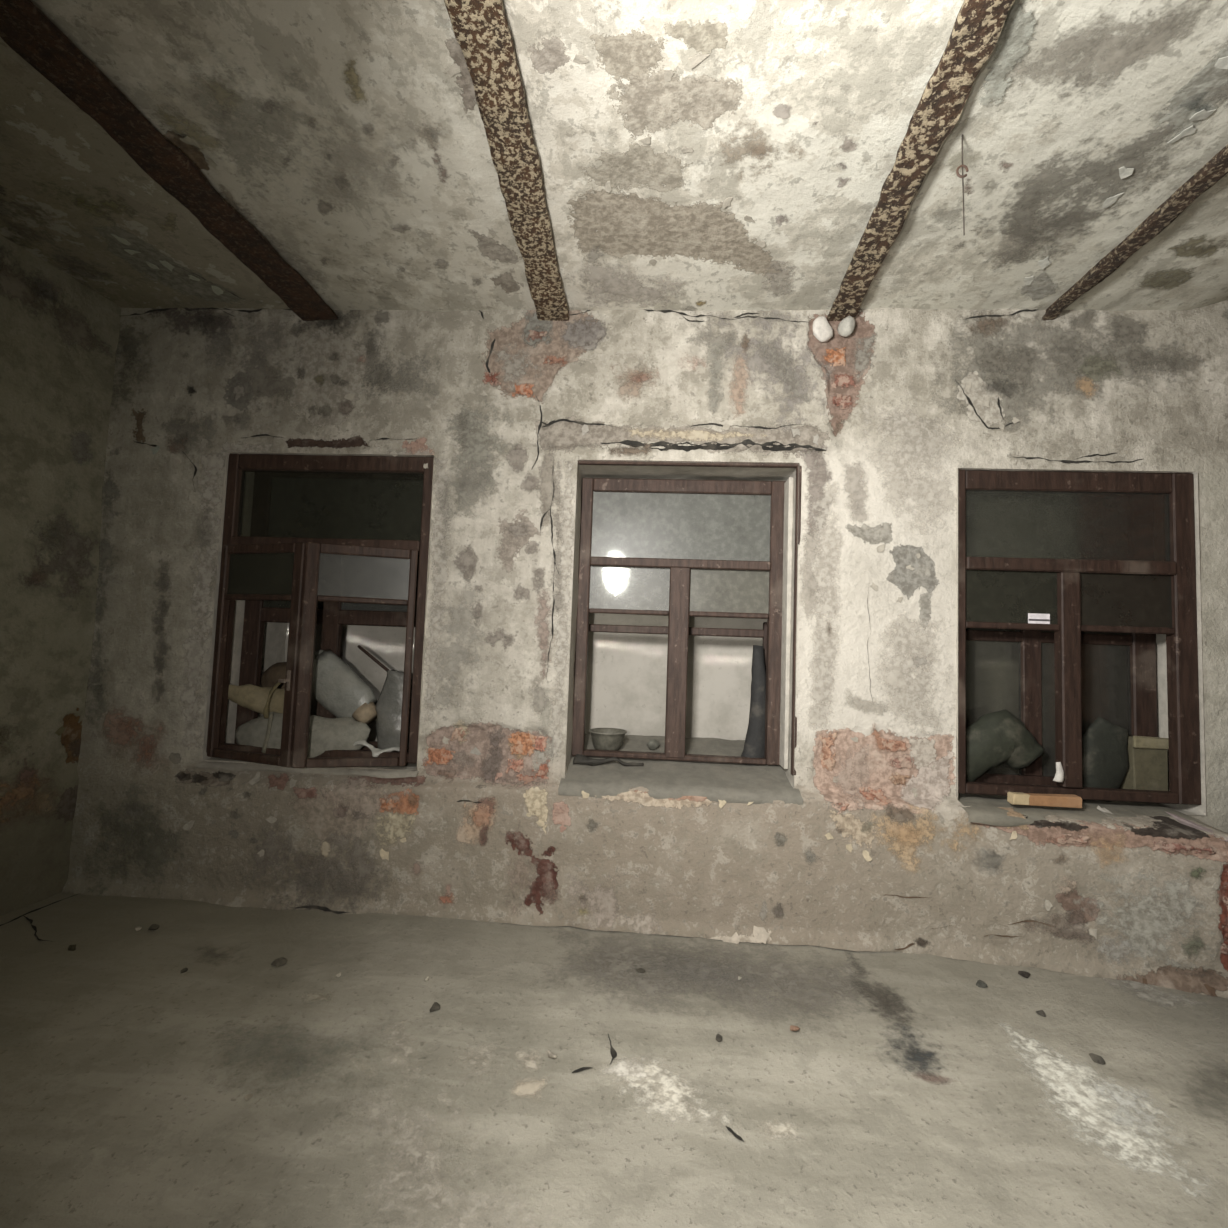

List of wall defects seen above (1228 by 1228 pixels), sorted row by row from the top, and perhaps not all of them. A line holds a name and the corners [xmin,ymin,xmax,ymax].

spalling [480,309,876,491]
peeling [453,509,544,649]
crack [532,398,559,680]
peeling [847,522,939,631]
crack [0,893,81,942]
spalling [175,721,571,861]
corrosion [456,797,497,846]
corrosion [506,831,559,915]
peeling [582,789,726,809]
spalling [813,727,956,862]